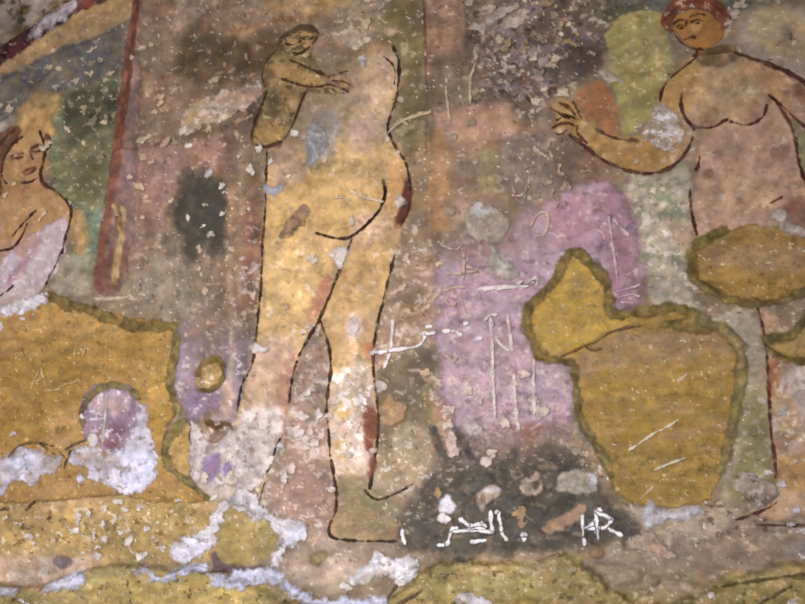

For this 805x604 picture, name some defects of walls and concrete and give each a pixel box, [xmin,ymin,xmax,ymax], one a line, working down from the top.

spalling [468,2,530,52]
spalling [521,20,580,54]
spalling [600,71,623,82]
leakage [173,173,225,261]
leakage [411,426,704,560]
leakage [132,552,387,604]